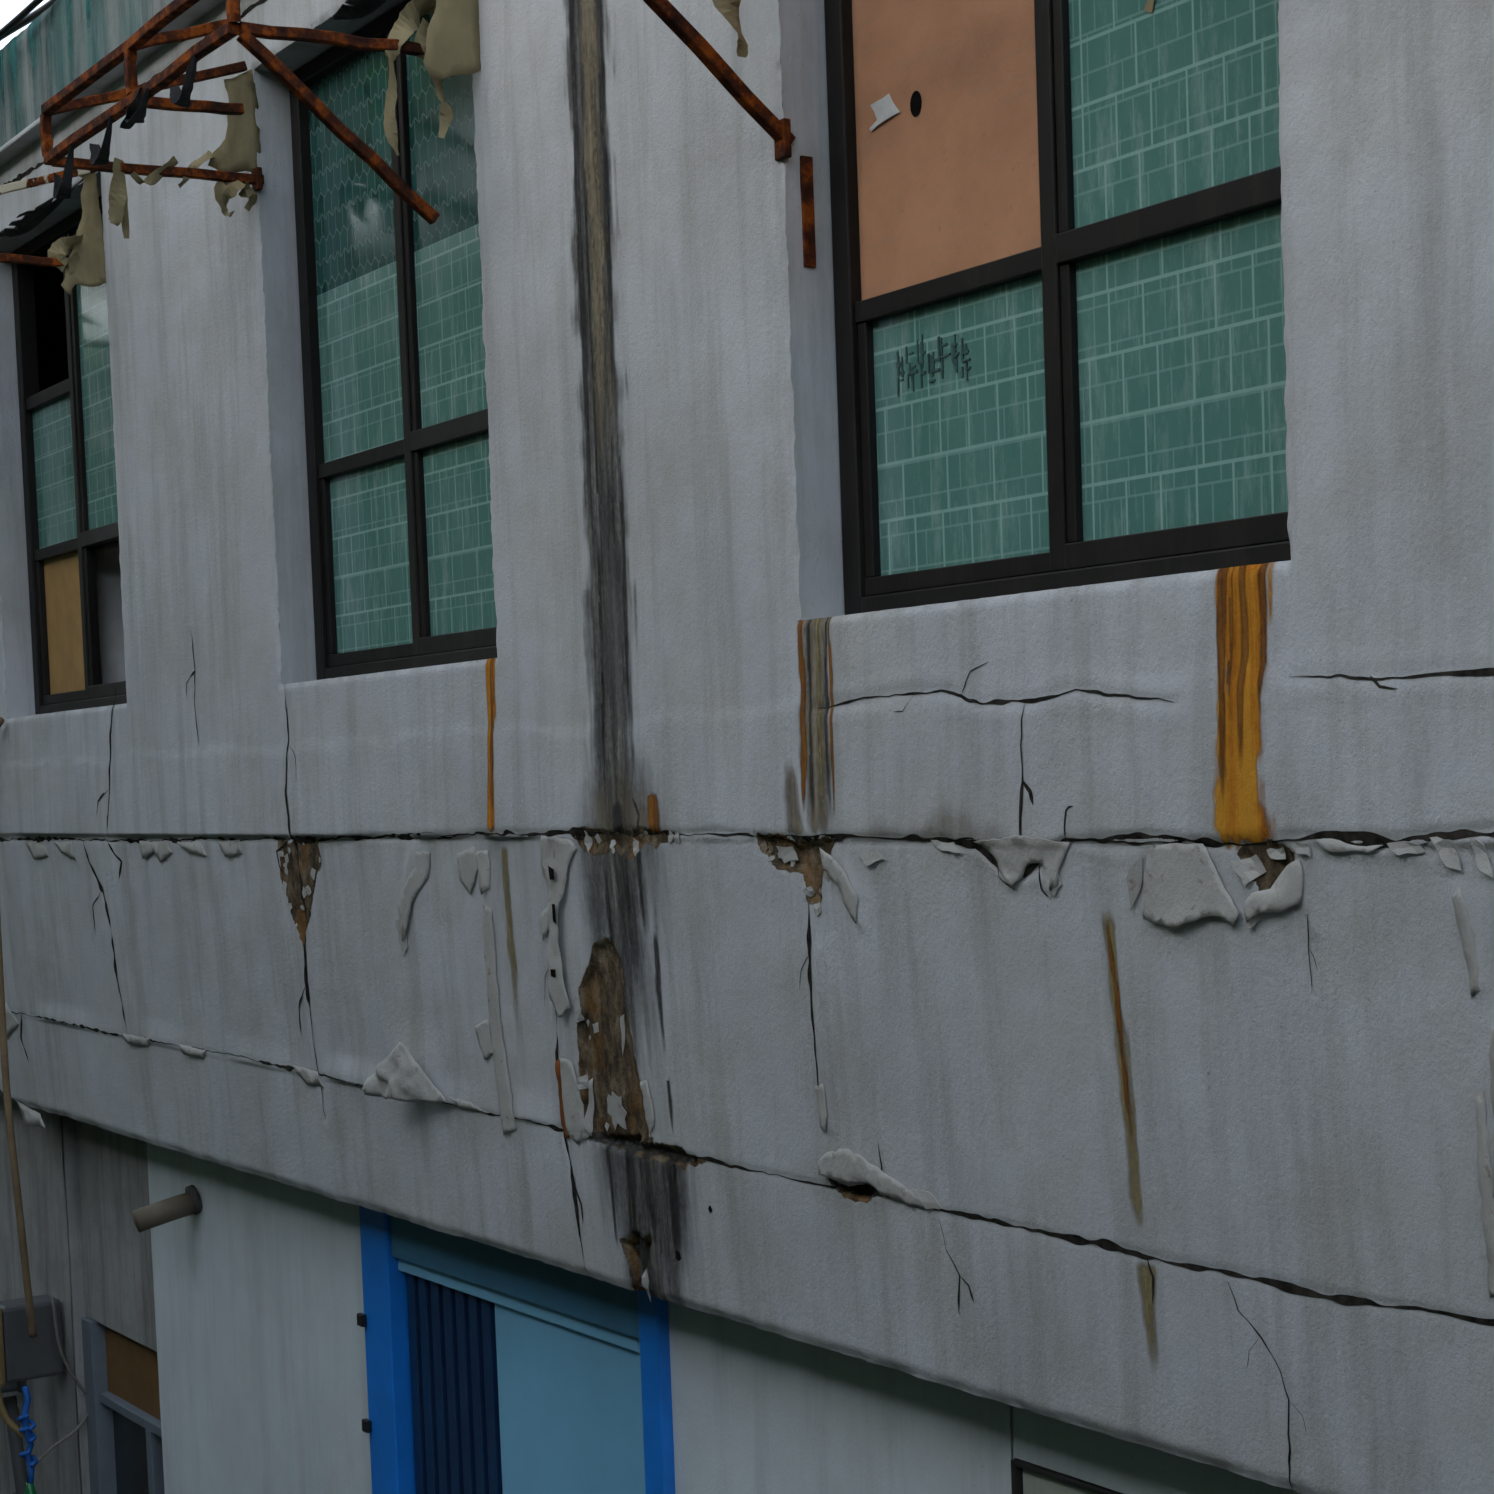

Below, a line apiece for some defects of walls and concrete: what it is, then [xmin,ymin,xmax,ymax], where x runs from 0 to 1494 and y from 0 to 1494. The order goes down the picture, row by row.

water stain [567,0,664,1060]
rust [798,617,834,832]
rust [1214,562,1273,848]
spalling [277,836,321,946]
spalling [540,825,706,1170]
water stain [601,1143,687,1305]
crack [441,1102,891,1266]
crack [0,662,1494,1118]
peeling [817,1149,943,1210]
rust [1103,918,1142,1220]
crack [932,1208,1494,1487]
peeling [1126,837,1493,997]